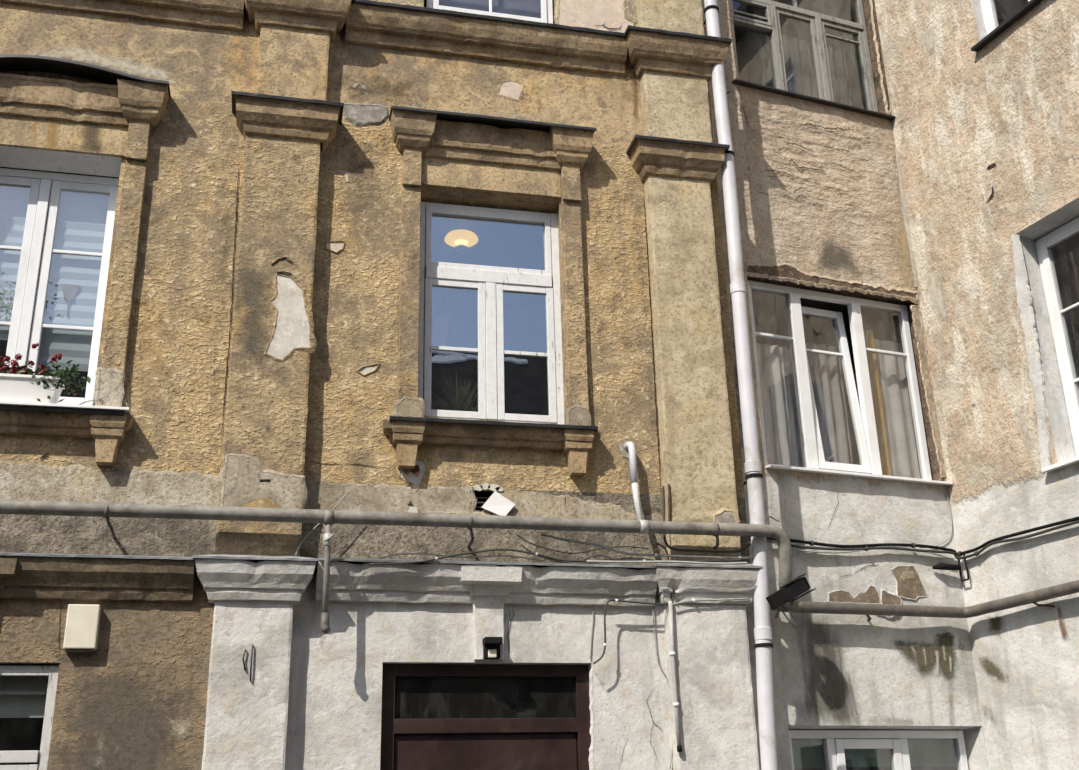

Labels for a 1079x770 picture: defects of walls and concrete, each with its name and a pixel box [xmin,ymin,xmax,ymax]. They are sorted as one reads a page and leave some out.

peeling [554,0,637,33]
peeling [344,82,386,123]
leakage [820,241,854,269]
peeling [263,274,316,363]
peeling [0,456,660,521]
peeling [827,565,928,619]
leakage [805,624,856,718]